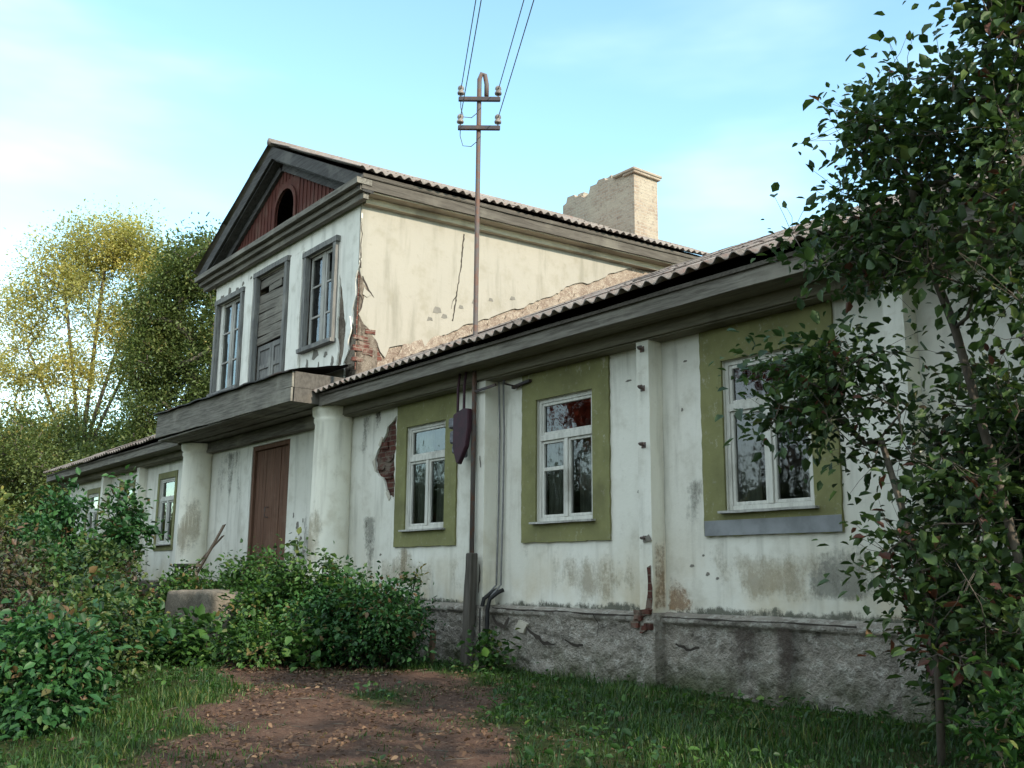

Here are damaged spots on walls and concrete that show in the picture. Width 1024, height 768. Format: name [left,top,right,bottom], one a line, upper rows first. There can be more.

crack [451,234,465,321]
flaking render [345,271,653,378]
flaking render [372,419,397,501]
leakage [498,601,639,611]
leakage [677,557,903,707]